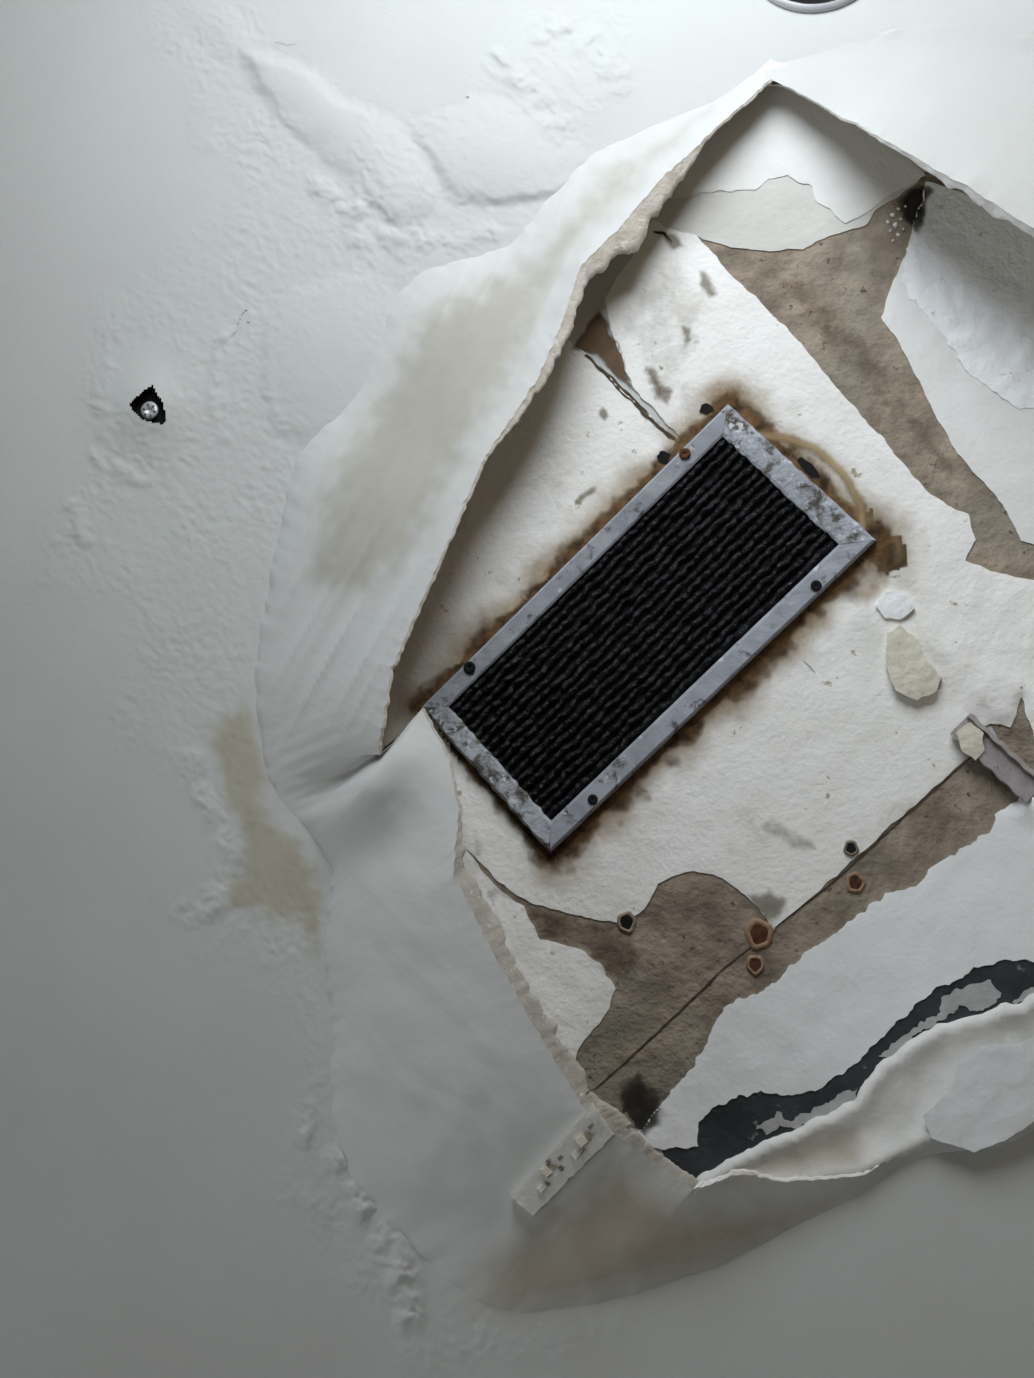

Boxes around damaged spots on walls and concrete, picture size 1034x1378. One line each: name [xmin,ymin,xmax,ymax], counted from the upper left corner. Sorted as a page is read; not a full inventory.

leakage [900,187,933,231]
leakage [701,273,713,294]
leakage [405,467,661,718]
leakage [765,603,825,669]
peeling [254,24,1034,1314]
leakage [692,691,748,724]
leakage [752,893,784,918]
leakage [621,1074,659,1135]